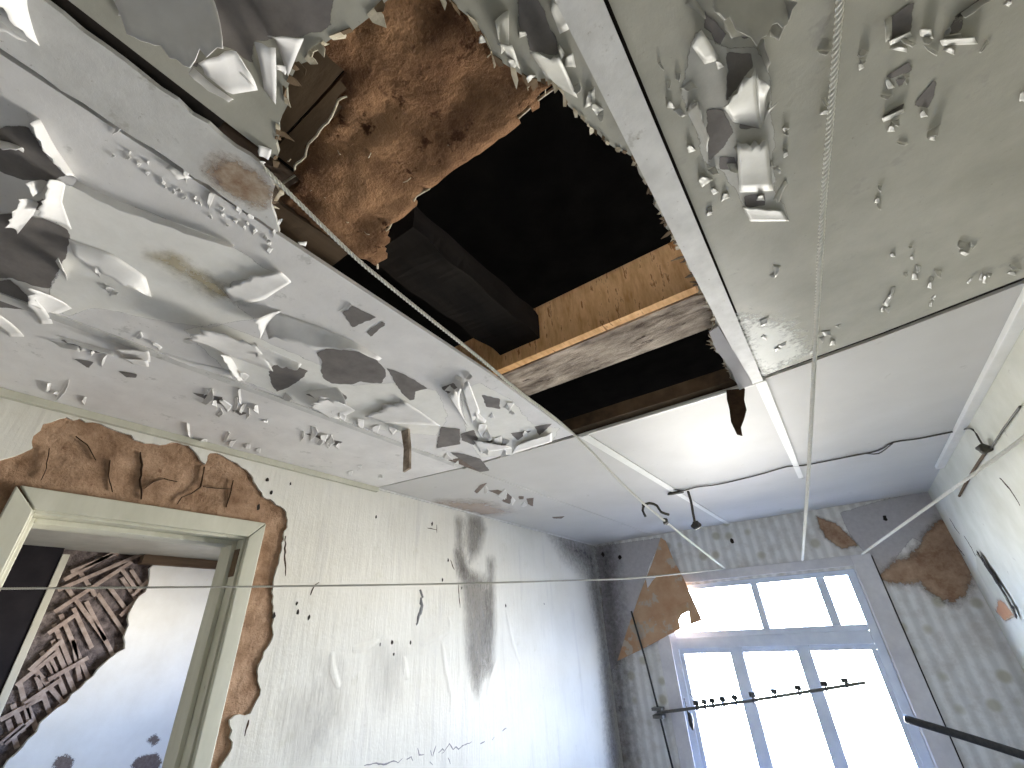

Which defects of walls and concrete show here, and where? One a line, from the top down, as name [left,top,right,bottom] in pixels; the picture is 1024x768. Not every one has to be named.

peeling [0,0,40,46]
peeling [113,0,333,104]
peeling [479,0,604,122]
peeling [658,0,798,221]
peeling [881,0,992,146]
peeling [0,119,560,507]
peeling [739,314,840,376]
crack [75,436,113,492]
crack [139,452,234,507]
flaking render [0,418,287,768]
leakage [459,518,493,683]
leakage [559,537,630,766]